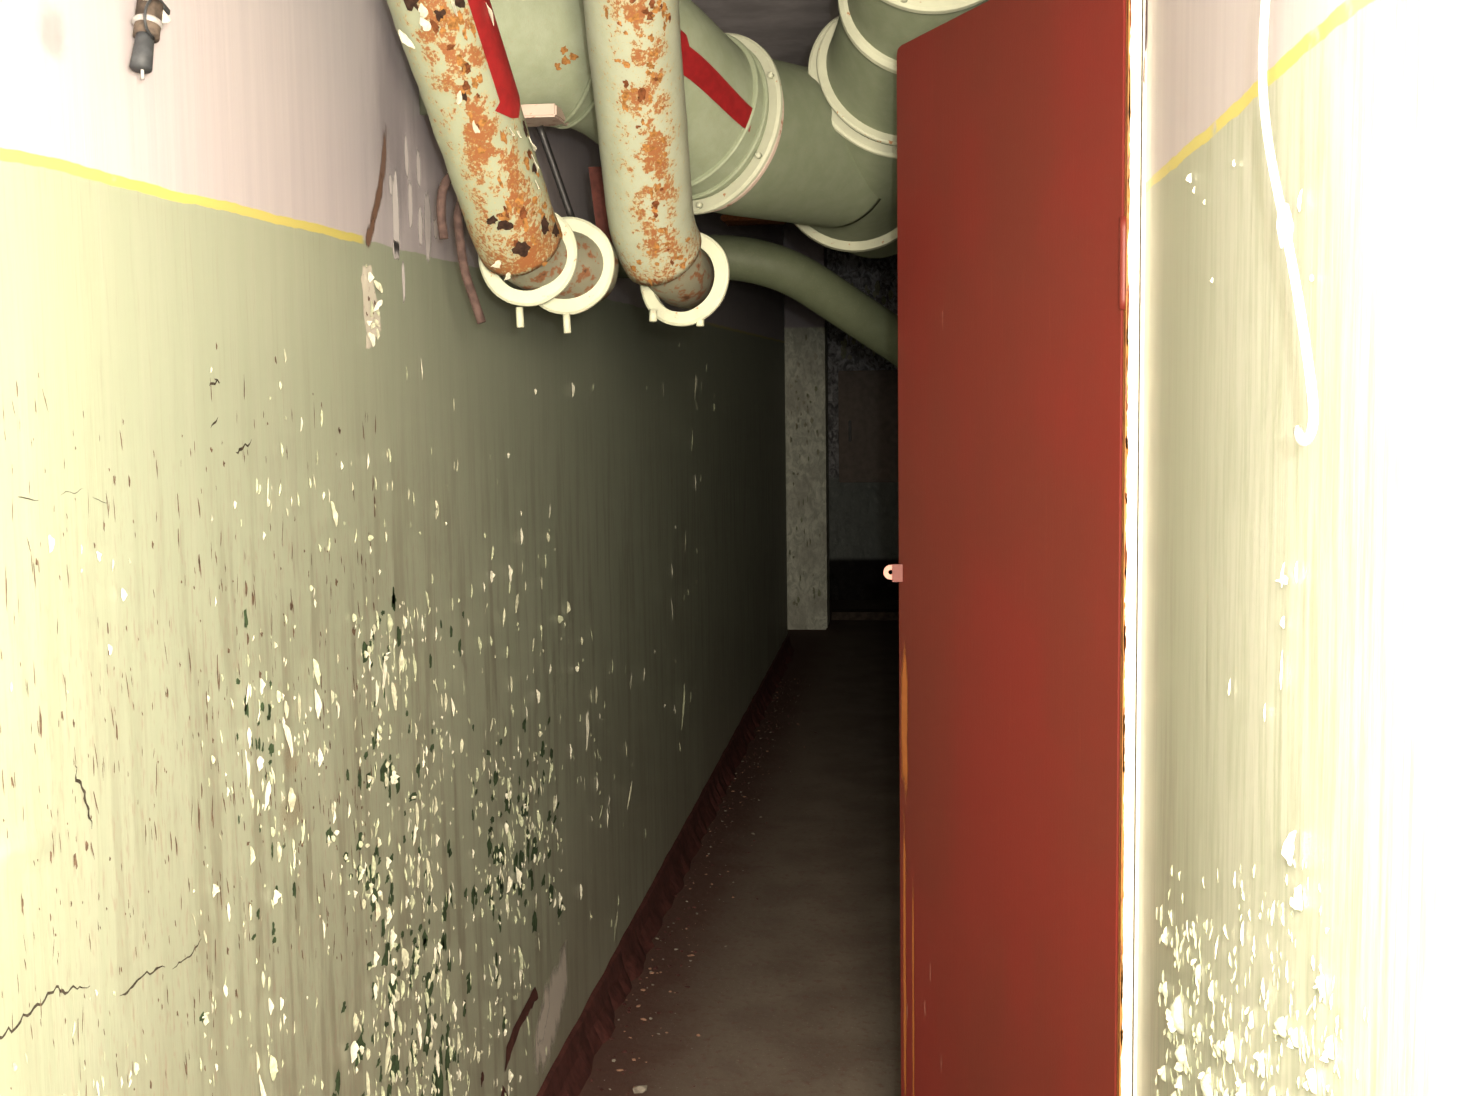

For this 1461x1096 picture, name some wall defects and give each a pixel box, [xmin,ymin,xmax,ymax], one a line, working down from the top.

peeling [256,449,415,564]
peeling [193,506,645,1096]
crack [0,938,202,1039]
peeling [1155,830,1358,1096]